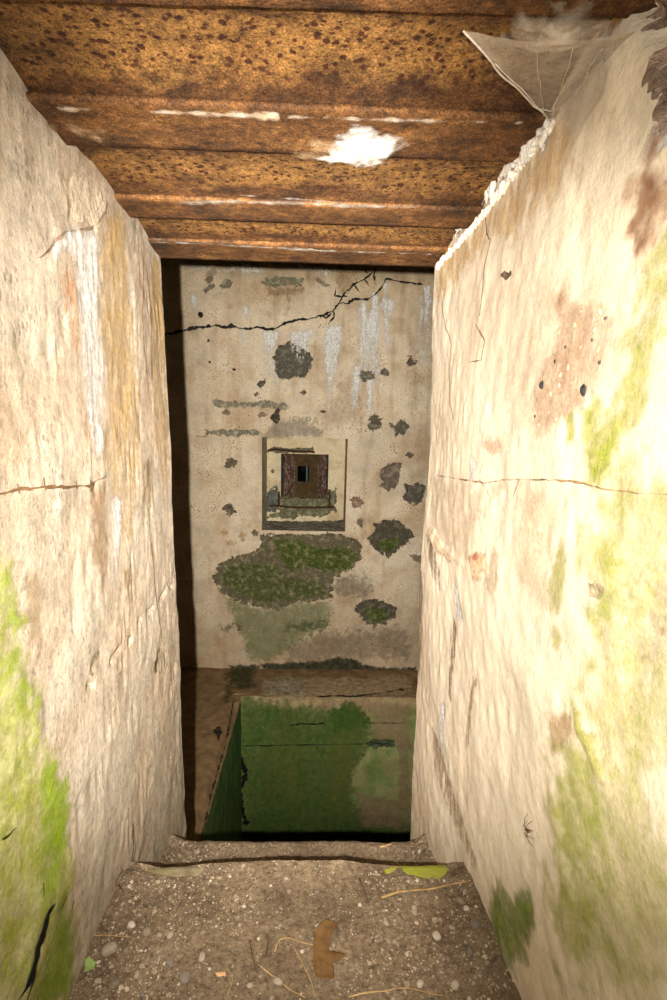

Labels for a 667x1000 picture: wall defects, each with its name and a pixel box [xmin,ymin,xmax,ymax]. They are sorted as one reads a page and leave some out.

spalling [272,341,313,380]
crack [141,217,490,417]
leakage [323,325,342,397]
leakage [350,283,395,417]
crack [0,476,106,495]
spalling [379,452,426,506]
crack [437,475,667,496]
spalling [211,485,421,611]
spalling [355,599,397,628]
crack [19,883,74,1000]